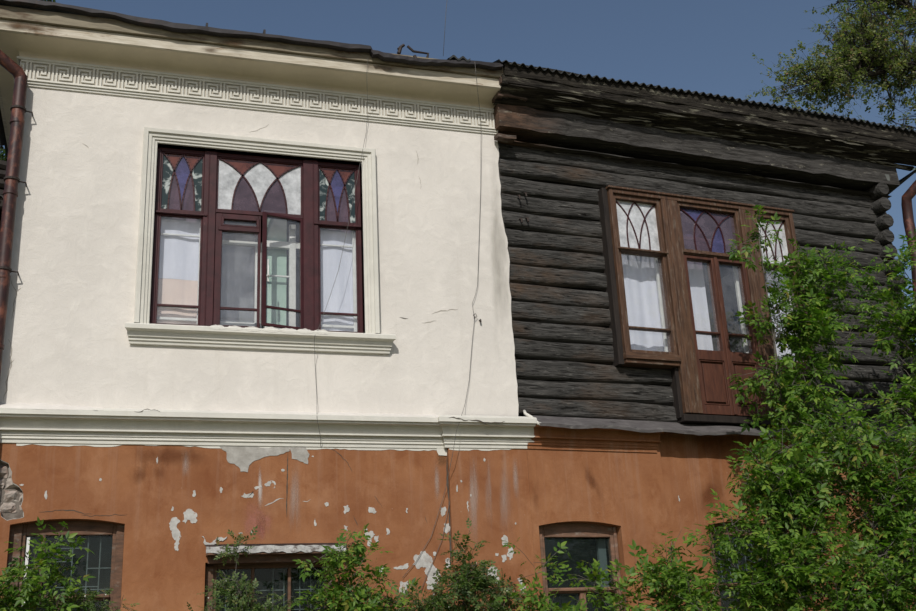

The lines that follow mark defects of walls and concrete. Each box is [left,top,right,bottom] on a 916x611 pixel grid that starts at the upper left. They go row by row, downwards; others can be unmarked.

flaking render [220,446,314,472]
flaking render [0,459,24,521]
peeling [169,506,197,551]
peeling [394,551,450,590]